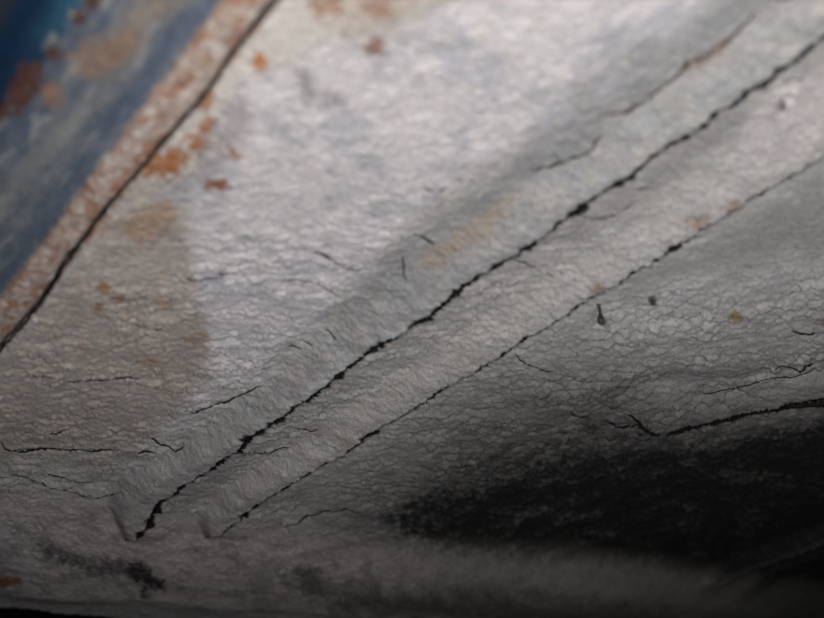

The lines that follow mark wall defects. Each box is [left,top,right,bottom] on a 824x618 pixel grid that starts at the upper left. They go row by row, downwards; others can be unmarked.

rust [366,39,384,54]
rust [254,54,266,71]
rust [0,61,62,121]
crack [528,0,788,175]
rust [142,92,217,177]
crack [0,0,279,353]
rust [205,179,231,190]
crack [125,36,824,541]
crack [33,375,136,383]
crack [2,429,116,453]
crack [10,473,120,499]